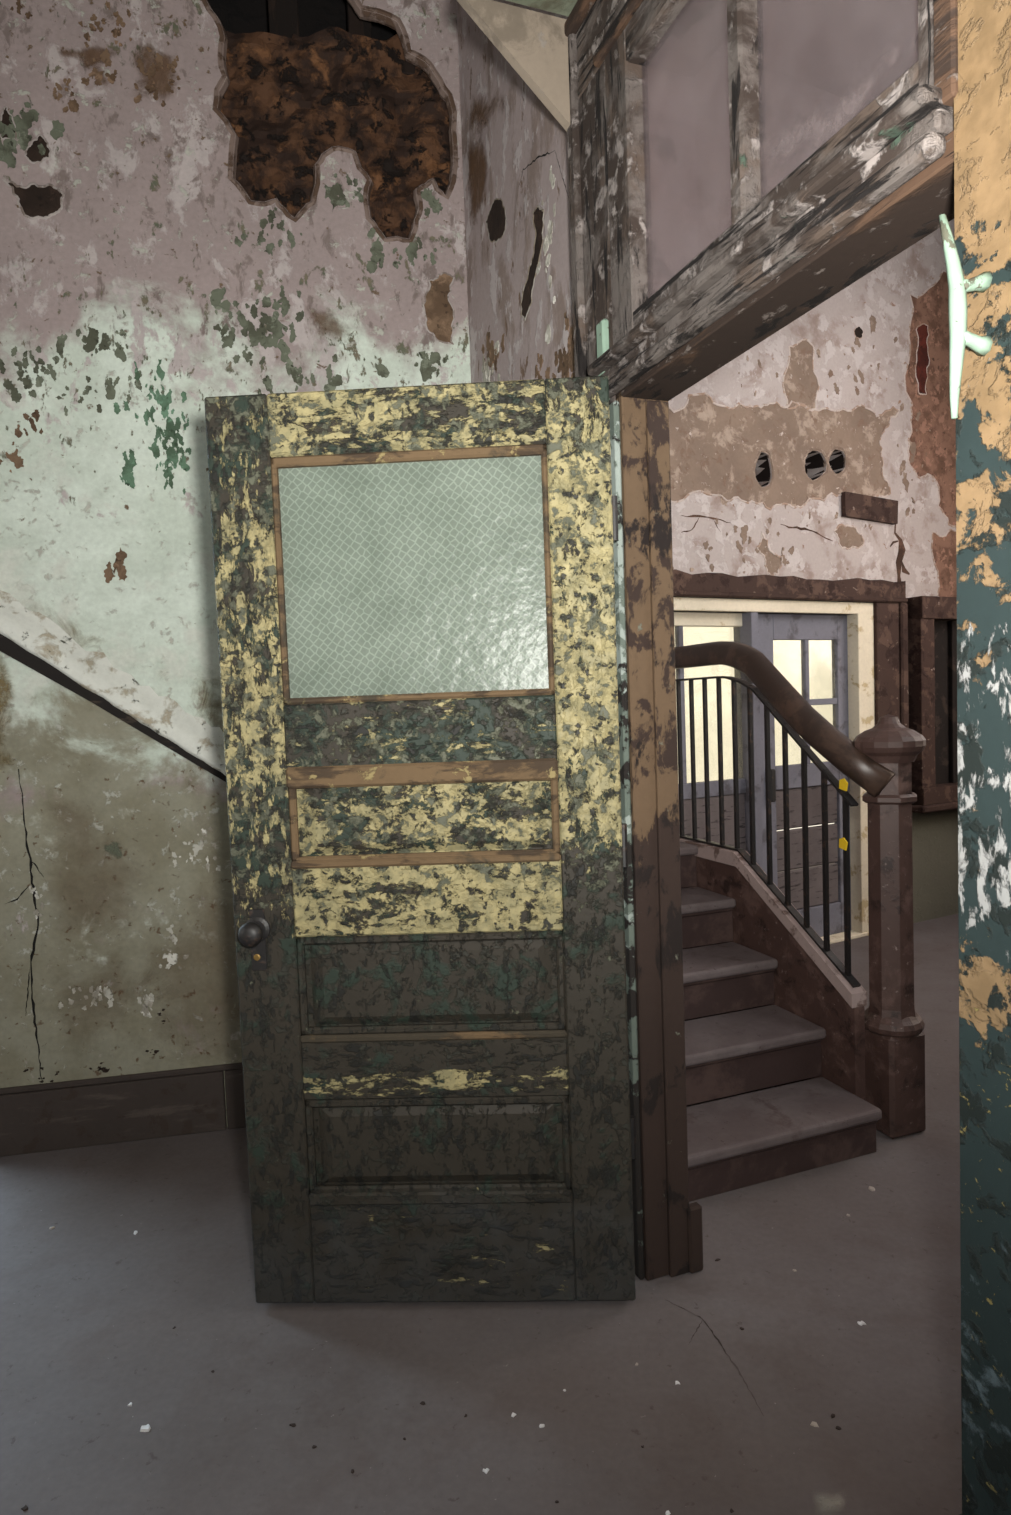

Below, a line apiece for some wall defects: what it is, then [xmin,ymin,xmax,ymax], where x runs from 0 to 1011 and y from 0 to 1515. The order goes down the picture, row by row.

flaking render [200,0,458,394]
damp [0,665,11,763]
peeling [0,327,192,495]
peeling [104,548,127,583]
flaking render [669,270,957,597]
crack [8,769,43,1081]